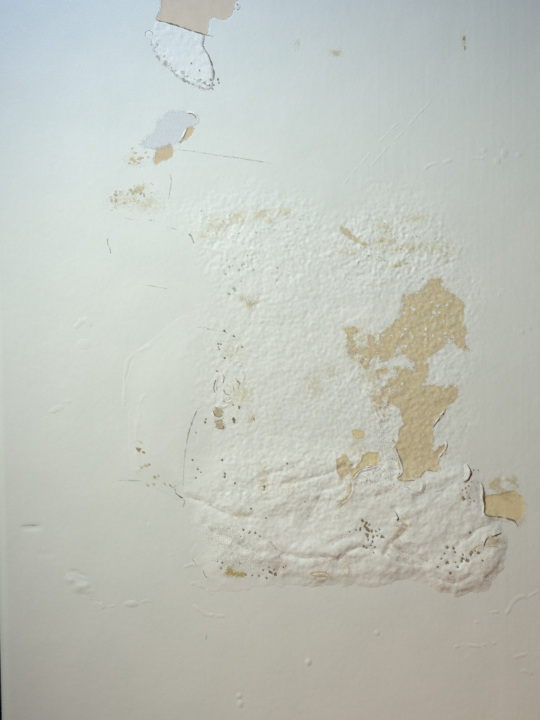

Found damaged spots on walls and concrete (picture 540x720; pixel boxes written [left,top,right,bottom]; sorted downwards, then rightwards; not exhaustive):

peeling [156,0,240,34]
peeling [140,111,199,164]
peeling [336,277,469,508]
peeling [475,476,526,548]